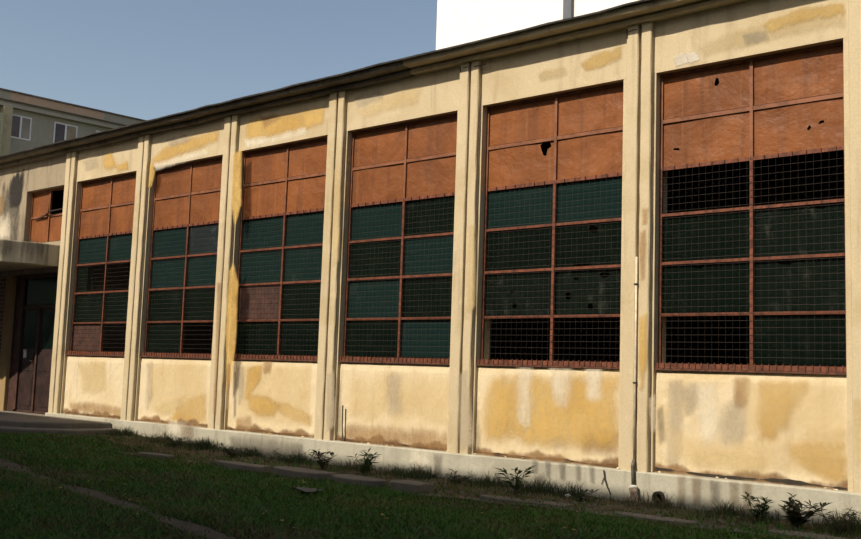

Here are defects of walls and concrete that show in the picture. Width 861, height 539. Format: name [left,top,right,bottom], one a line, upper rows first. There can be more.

peeling [675,4,844,66]
mould [0,172,36,257]
water stain [461,376,471,445]
water stain [725,380,746,437]
water stain [760,383,804,438]